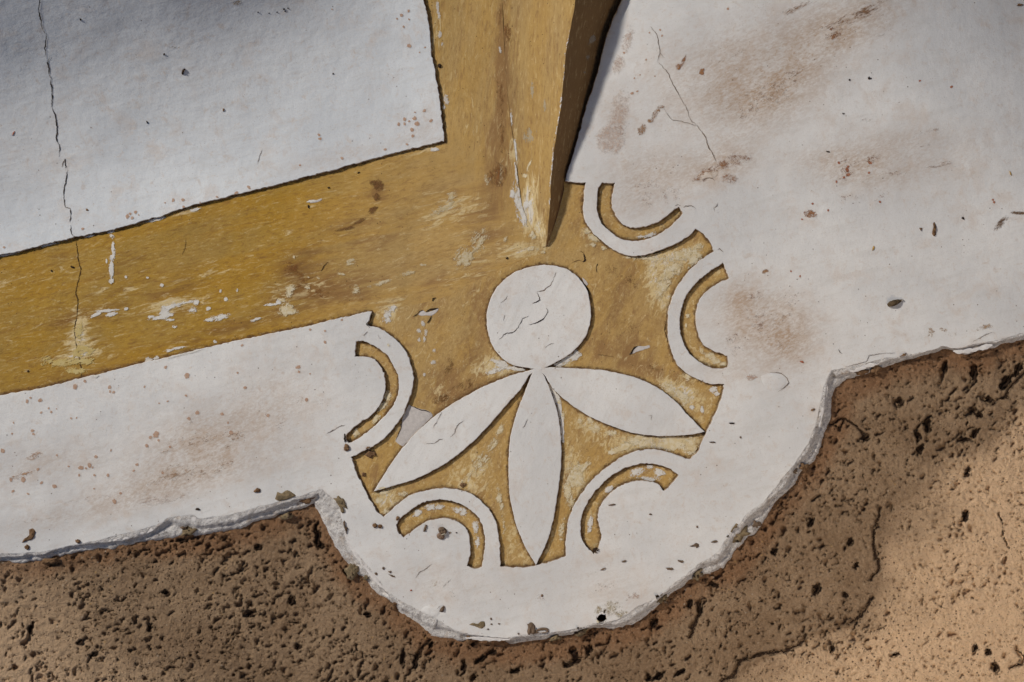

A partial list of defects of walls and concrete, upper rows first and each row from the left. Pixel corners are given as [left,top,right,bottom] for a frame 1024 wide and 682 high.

crack [650,26,715,158]
crack [38,0,82,377]
peeling [39,307,128,389]
peeling [106,230,127,284]
peeling [148,289,238,328]
peeling [251,276,320,322]
crack [500,251,598,348]
spalling [0,333,1024,644]